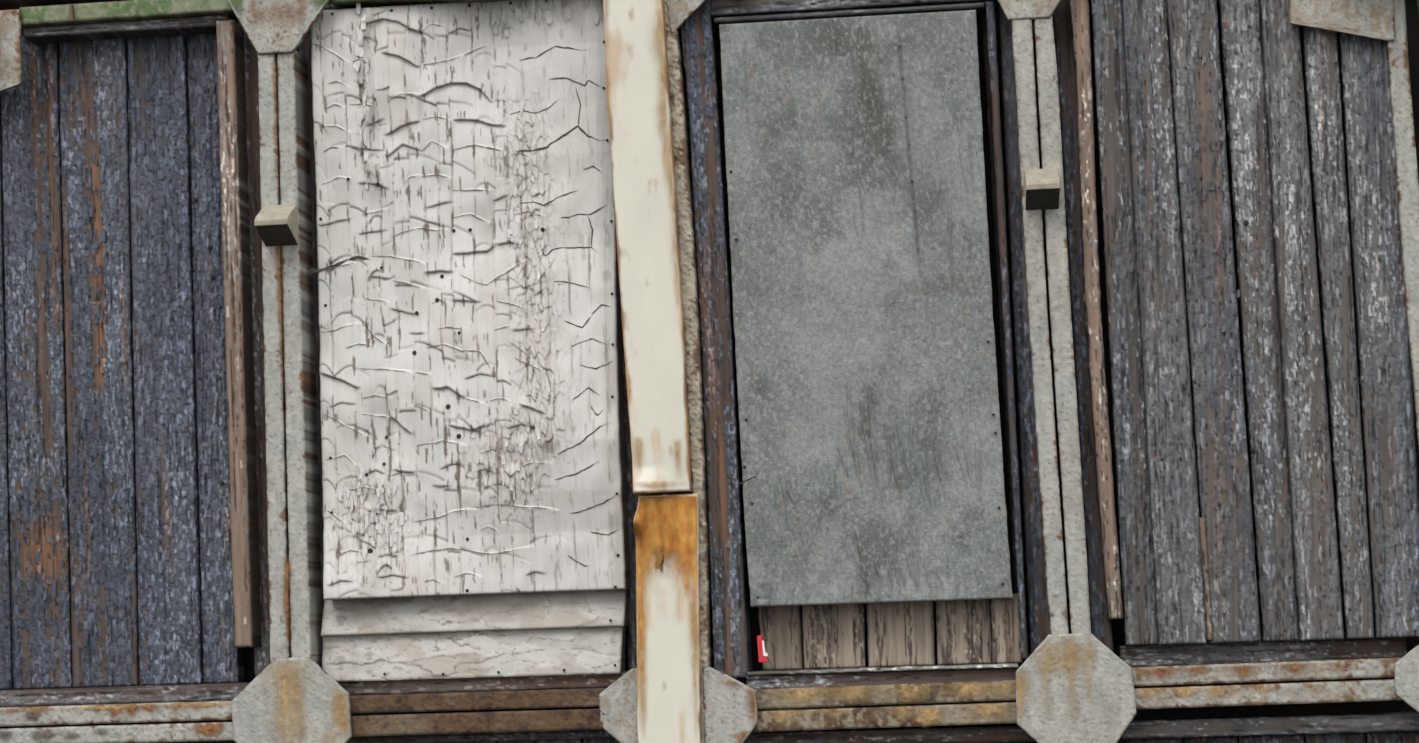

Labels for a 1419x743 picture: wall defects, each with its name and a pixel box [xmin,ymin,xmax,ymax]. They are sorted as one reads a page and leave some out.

peeling [82,135,107,324]
crack [308,19,618,586]
peeling [13,475,68,649]
corrosion [634,483,697,704]
corrosion [778,689,817,720]
corrosion [835,687,865,713]
corrosion [899,685,939,723]
corrosion [960,676,1022,716]
corrosion [1137,667,1225,697]